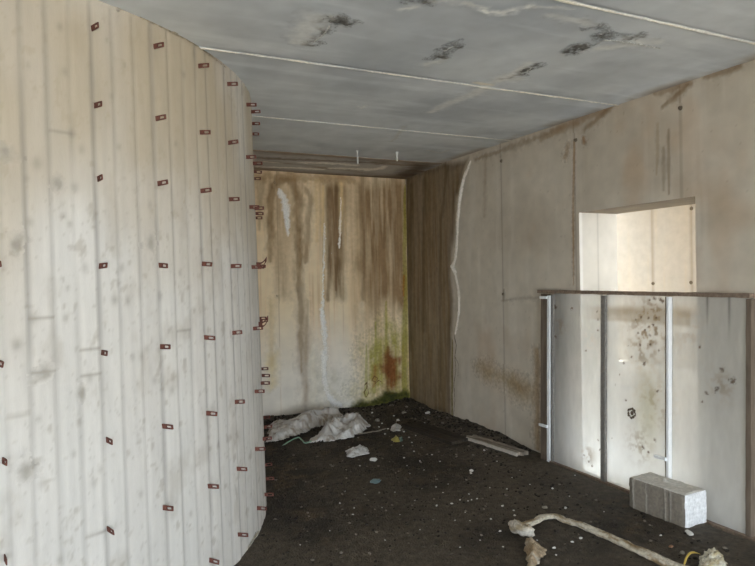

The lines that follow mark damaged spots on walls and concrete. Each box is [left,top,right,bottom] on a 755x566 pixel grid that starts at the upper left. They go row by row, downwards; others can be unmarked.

corrosion [370,342,405,390]
leakage [253,106,617,415]